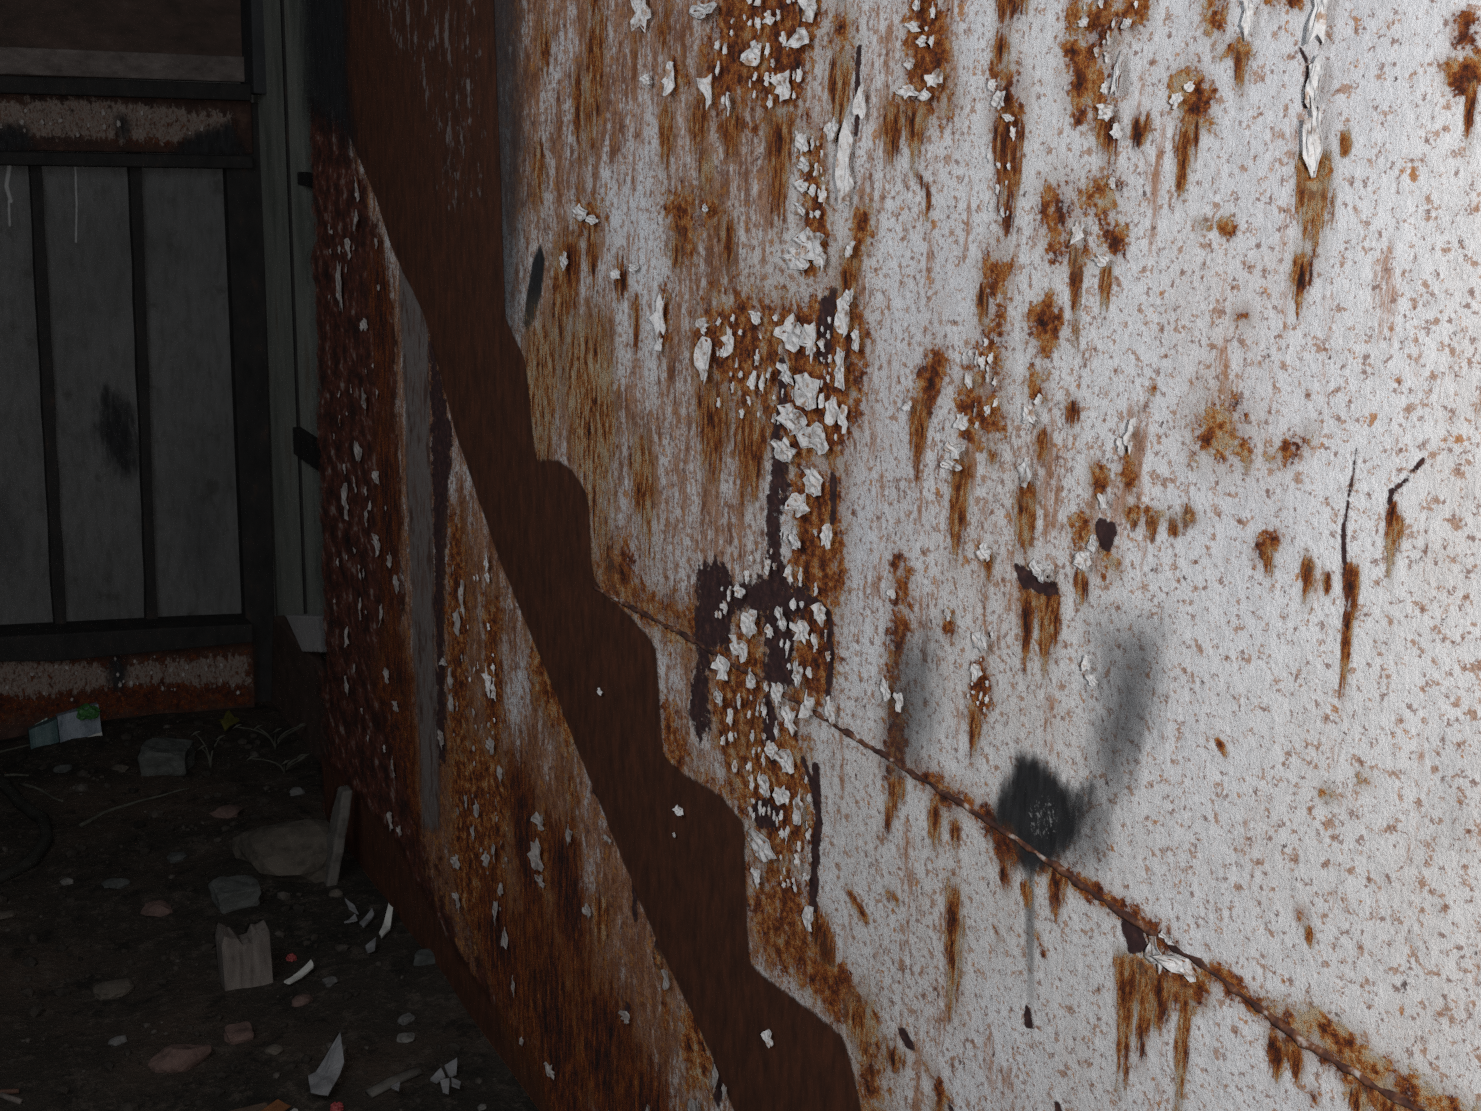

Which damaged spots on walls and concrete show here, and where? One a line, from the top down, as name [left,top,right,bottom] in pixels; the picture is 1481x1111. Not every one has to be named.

corrosion [882,89,958,222]
corrosion [1166,0,1253,199]
corrosion [1443,9,1481,140]
corrosion [901,0,1152,568]
corrosion [315,0,892,1111]
peeling [688,0,874,932]
crack [813,597,837,725]
crack [820,471,838,550]
corrosion [1122,502,1195,542]
corrosion [1178,379,1315,473]
corrosion [1300,554,1360,703]
corrosion [1205,956,1480,1111]